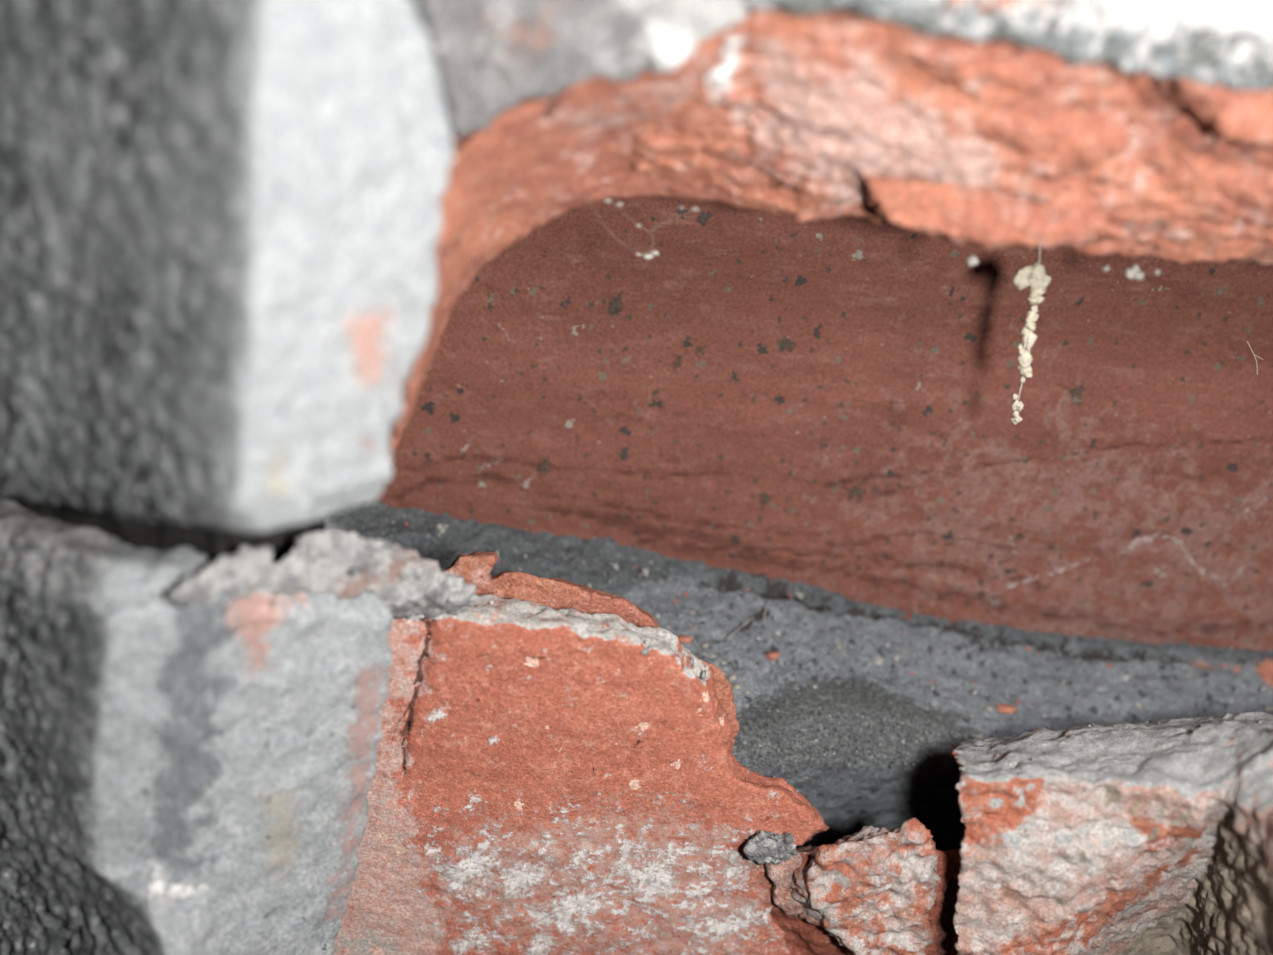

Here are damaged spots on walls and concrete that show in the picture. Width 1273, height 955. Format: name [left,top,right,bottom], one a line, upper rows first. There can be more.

spalling [377,7,1273,651]
crack [395,619,432,775]
efflorescence [405,790,779,955]
crack [935,879,959,955]